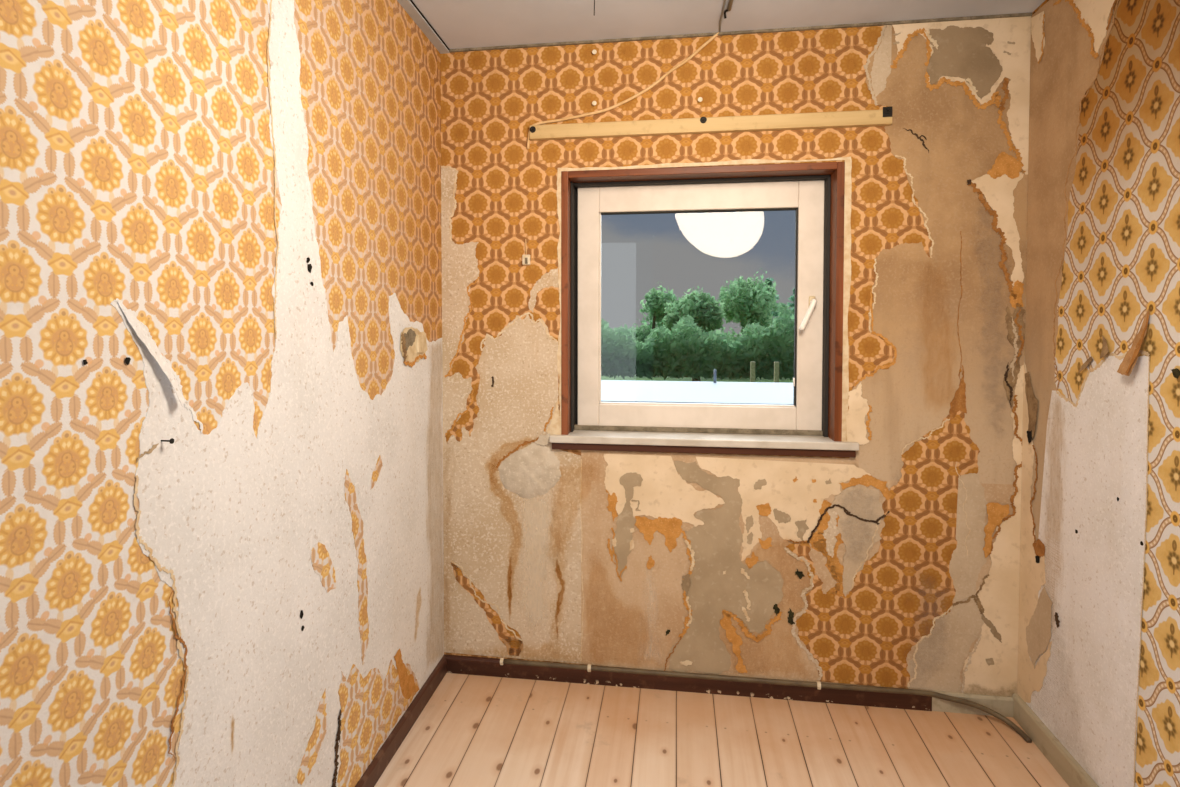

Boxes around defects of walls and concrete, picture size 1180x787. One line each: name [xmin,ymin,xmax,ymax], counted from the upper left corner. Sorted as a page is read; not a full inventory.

peeling [870,25,901,97]
spalling [926,25,1015,99]
peeling [987,152,1022,179]
spalling [544,157,872,445]
peeling [949,365,967,421]
spalling [605,461,809,674]
crack [790,504,890,543]
peeling [812,479,884,597]
peeling [949,462,1010,603]
peeling [1033,539,1045,558]